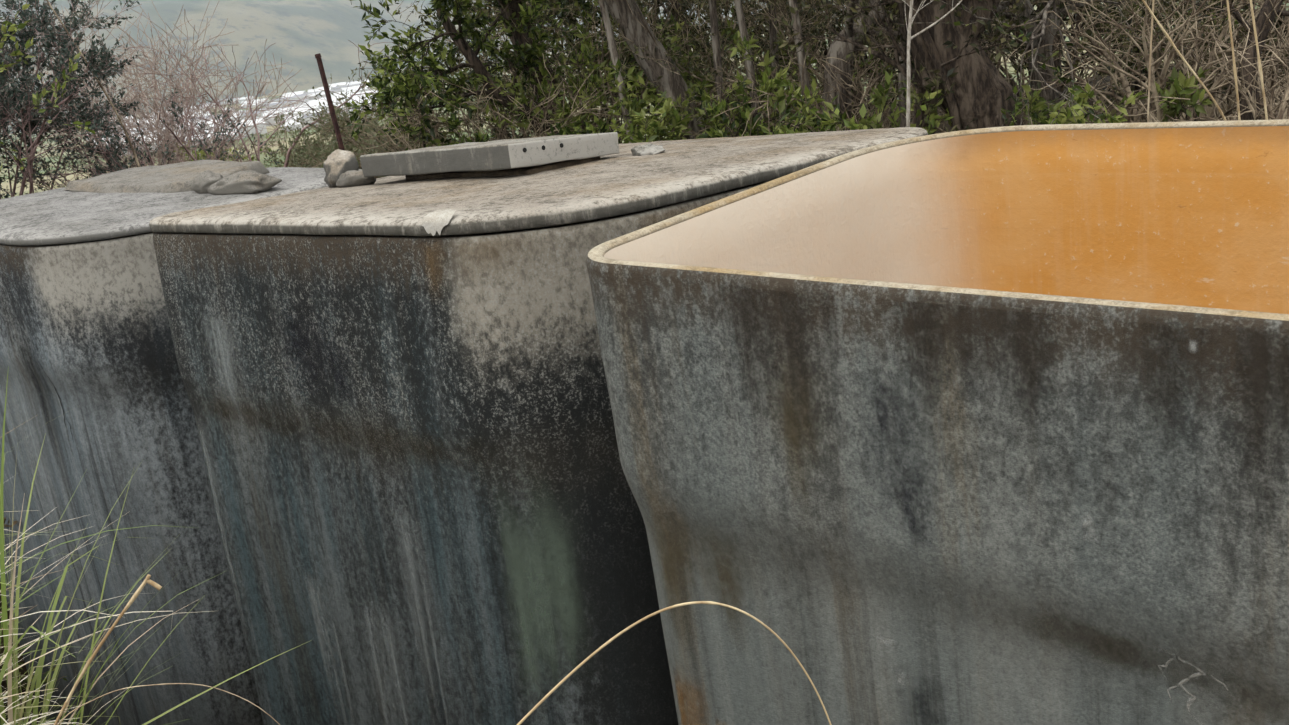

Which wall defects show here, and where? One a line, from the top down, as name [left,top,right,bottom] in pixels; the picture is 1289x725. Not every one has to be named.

crack [1158,660,1228,710]